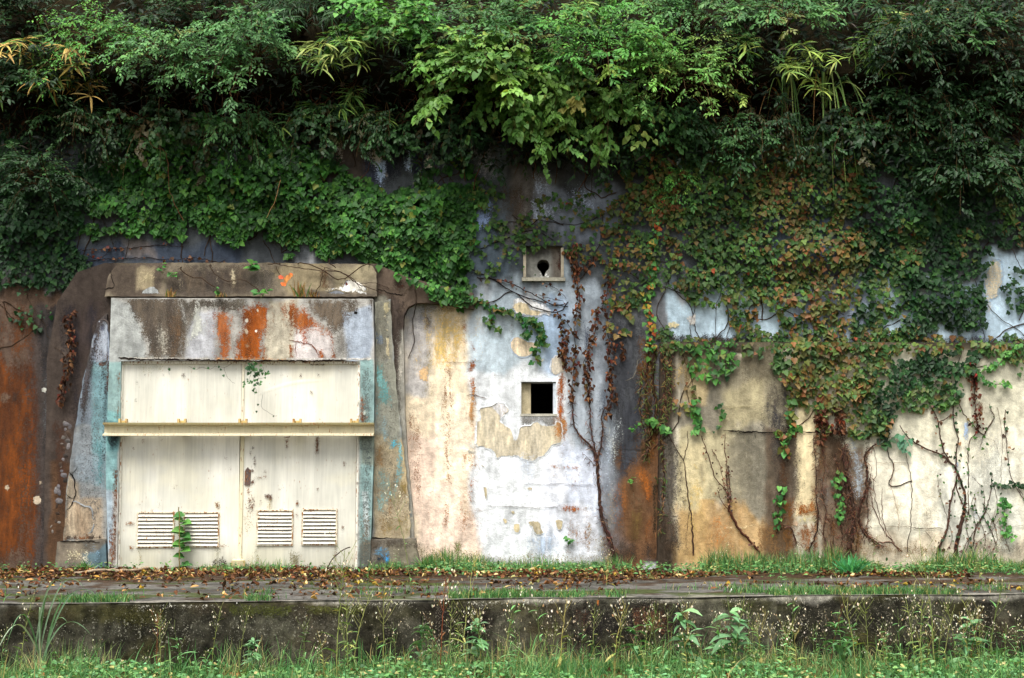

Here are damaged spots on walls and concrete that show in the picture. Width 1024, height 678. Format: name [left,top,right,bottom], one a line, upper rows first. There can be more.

peeling [91,319,110,383]
corrosion [209,300,336,375]
peeling [512,297,551,317]
peeling [510,337,567,375]
water stain [913,320,1024,343]
corrosion [0,295,42,569]
water stain [29,264,484,569]
peeling [467,400,564,462]
water stain [480,310,887,570]
peeling [50,421,94,536]